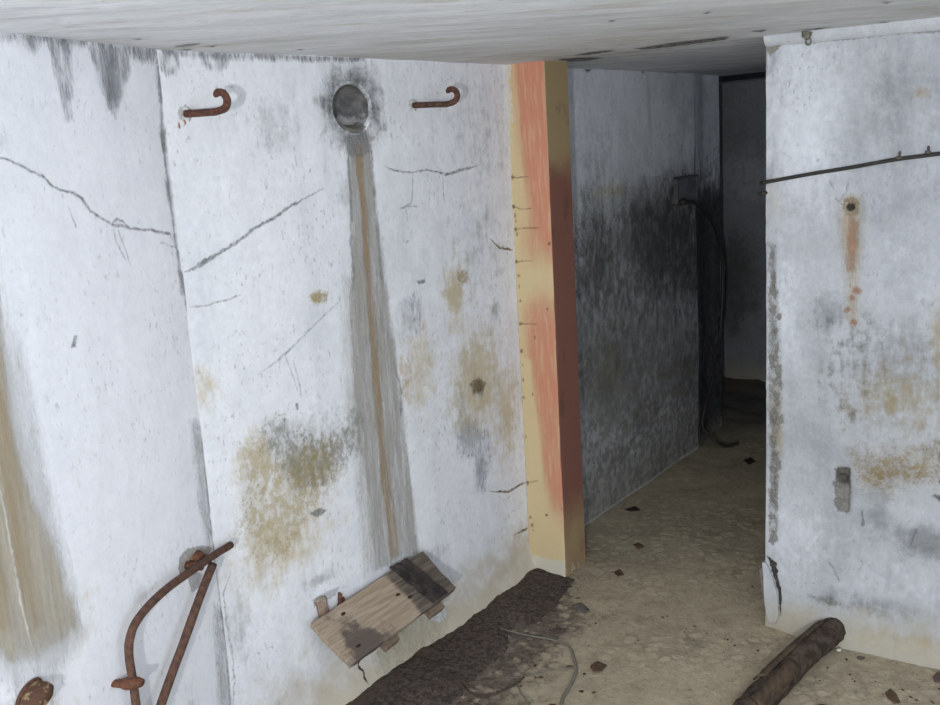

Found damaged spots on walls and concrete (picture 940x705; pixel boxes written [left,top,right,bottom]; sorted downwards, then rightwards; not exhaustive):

crack [2,61,301,307]
rust [843,197,859,273]
leakage [245,134,418,566]
leakage [574,170,722,518]
leakage [0,351,75,686]
crack [194,429,214,548]
spalling [833,467,851,512]
peeling [760,560,779,624]
crack [217,611,235,702]